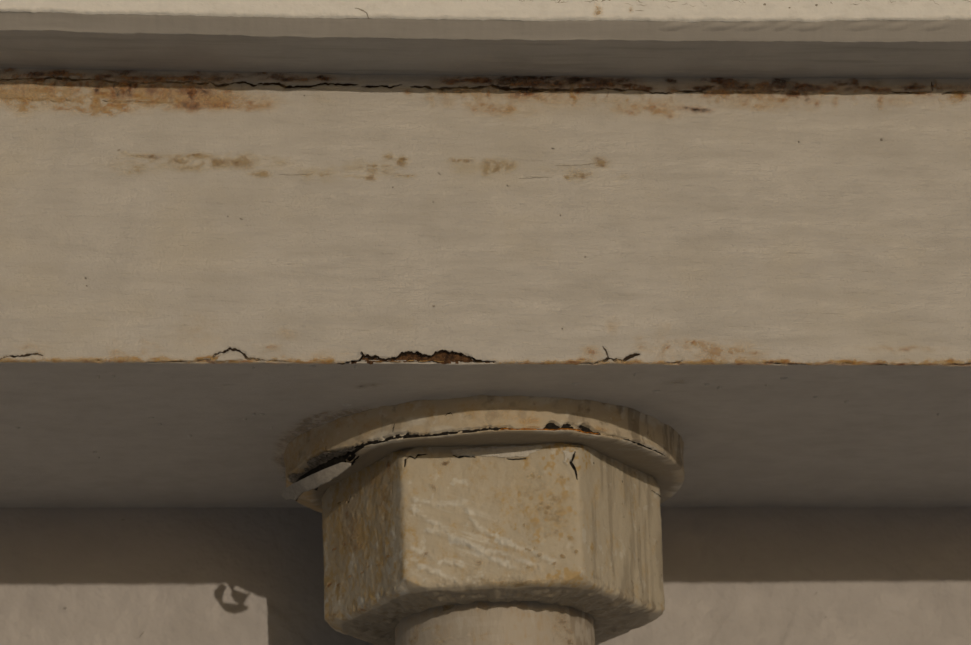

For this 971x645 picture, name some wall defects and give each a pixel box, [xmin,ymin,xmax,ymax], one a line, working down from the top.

corrosion [0,68,257,115]
crack [0,75,705,107]
corrosion [441,76,653,112]
corrosion [693,78,890,105]
crack [0,352,43,360]
corrosion [0,356,253,364]
crack [169,347,286,362]
spalling [337,350,494,365]
crack [580,346,640,364]
corrosion [500,340,971,366]
crack [288,412,665,501]
peeling [282,462,351,500]